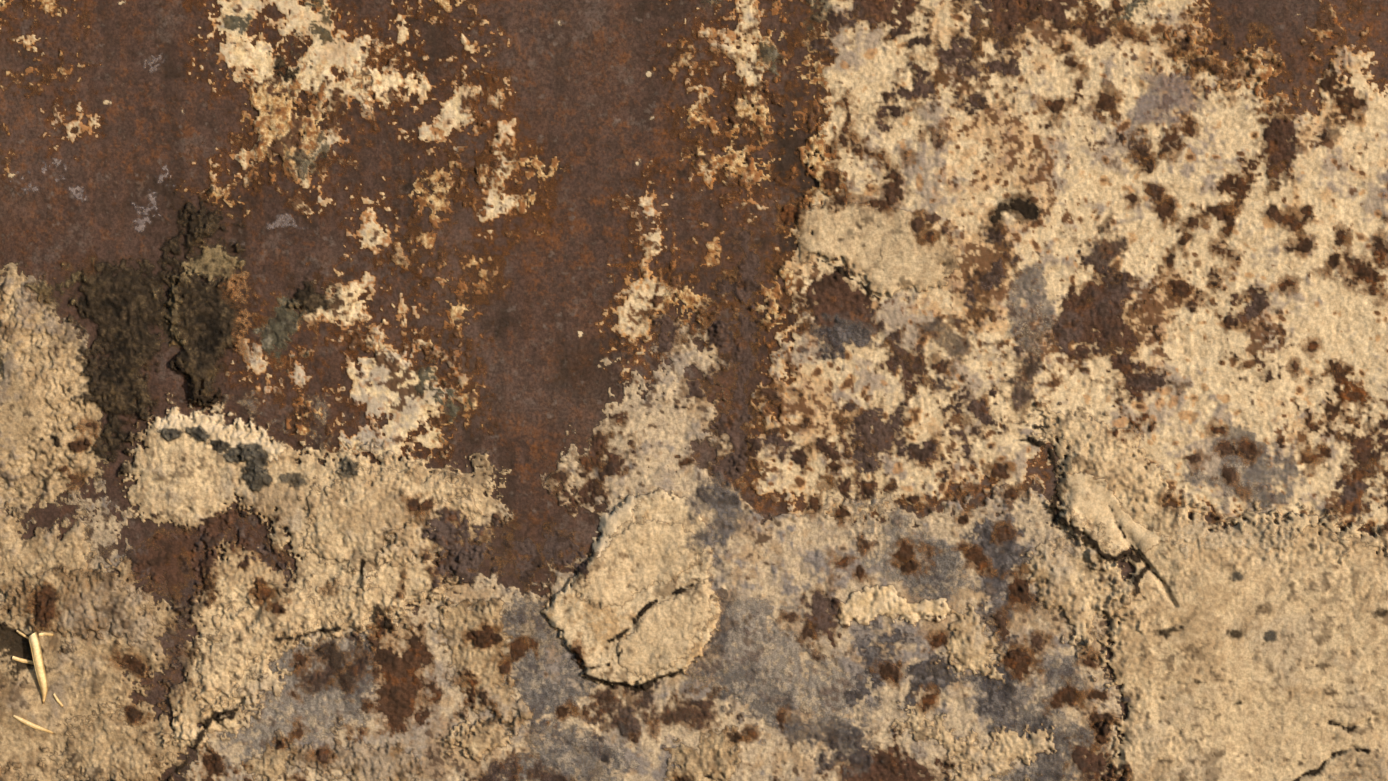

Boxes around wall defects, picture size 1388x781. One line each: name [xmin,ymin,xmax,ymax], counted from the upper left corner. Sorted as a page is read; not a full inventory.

peeling [153,0,567,462]
peeling [592,0,1388,558]
corrosion [674,0,1388,680]
peeling [374,489,487,577]
crack [1020,425,1163,599]
spalling [0,622,46,681]
corrosion [290,609,497,738]
corrosion [463,623,538,675]
corrosion [879,661,902,686]
corrosion [194,747,253,781]
peeling [436,717,513,763]
corrosion [1046,684,1132,781]